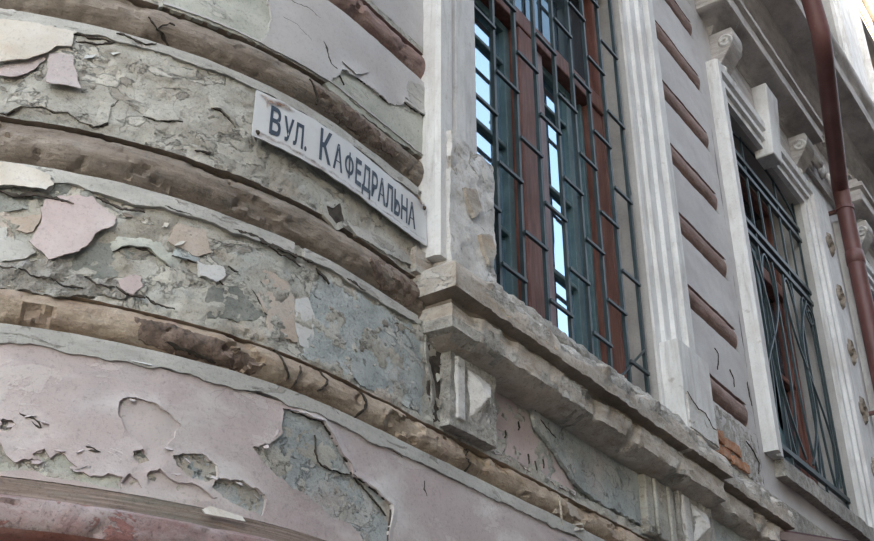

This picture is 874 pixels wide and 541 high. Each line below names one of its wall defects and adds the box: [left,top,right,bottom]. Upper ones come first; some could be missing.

peeling [0,8,97,89]
peeling [0,162,185,310]
peeling [31,398,264,515]
spalling [134,317,266,376]
spalling [196,261,267,323]
crack [272,349,329,391]
peeling [258,410,388,541]
crack [287,409,398,541]
crack [354,389,368,418]
flaking render [302,275,441,422]
peeling [528,409,642,525]
spalling [686,392,763,485]